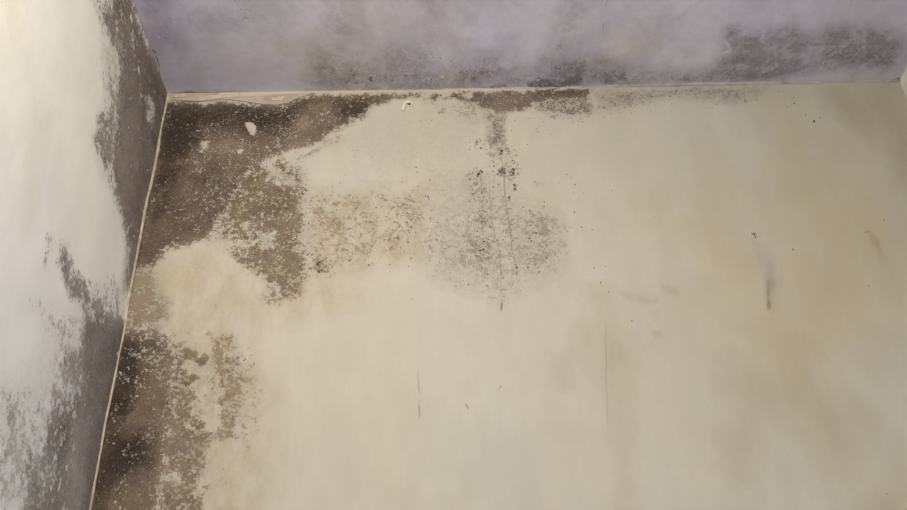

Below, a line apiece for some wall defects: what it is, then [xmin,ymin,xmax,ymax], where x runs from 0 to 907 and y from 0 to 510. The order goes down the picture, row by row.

damp [0,0,655,510]
damp [723,31,894,79]